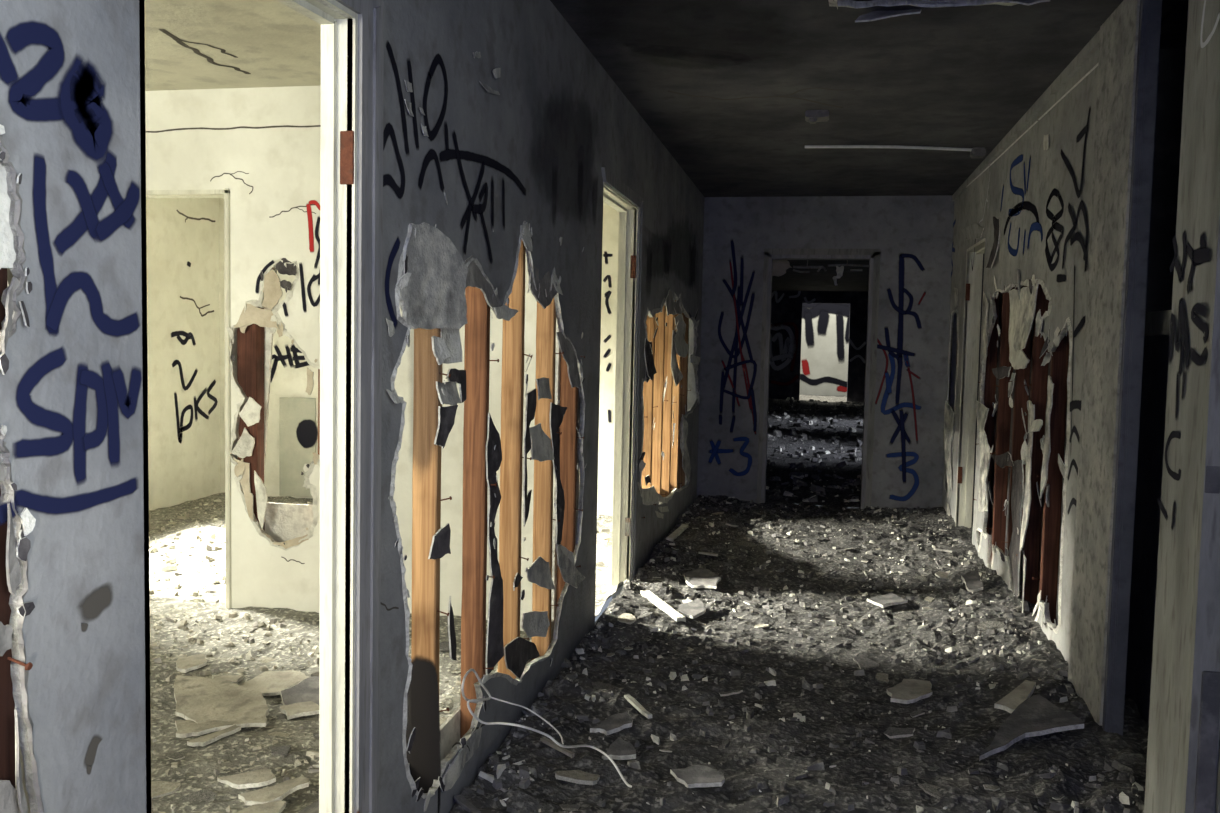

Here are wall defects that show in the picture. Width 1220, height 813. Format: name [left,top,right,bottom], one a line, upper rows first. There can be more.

crack [159,29,251,74]
flaking render [0,124,32,375]
flaking render [0,425,44,813]
flaking render [226,258,320,551]
flaking render [386,221,586,812]
flaking render [638,289,700,519]
flaking render [976,216,1072,634]